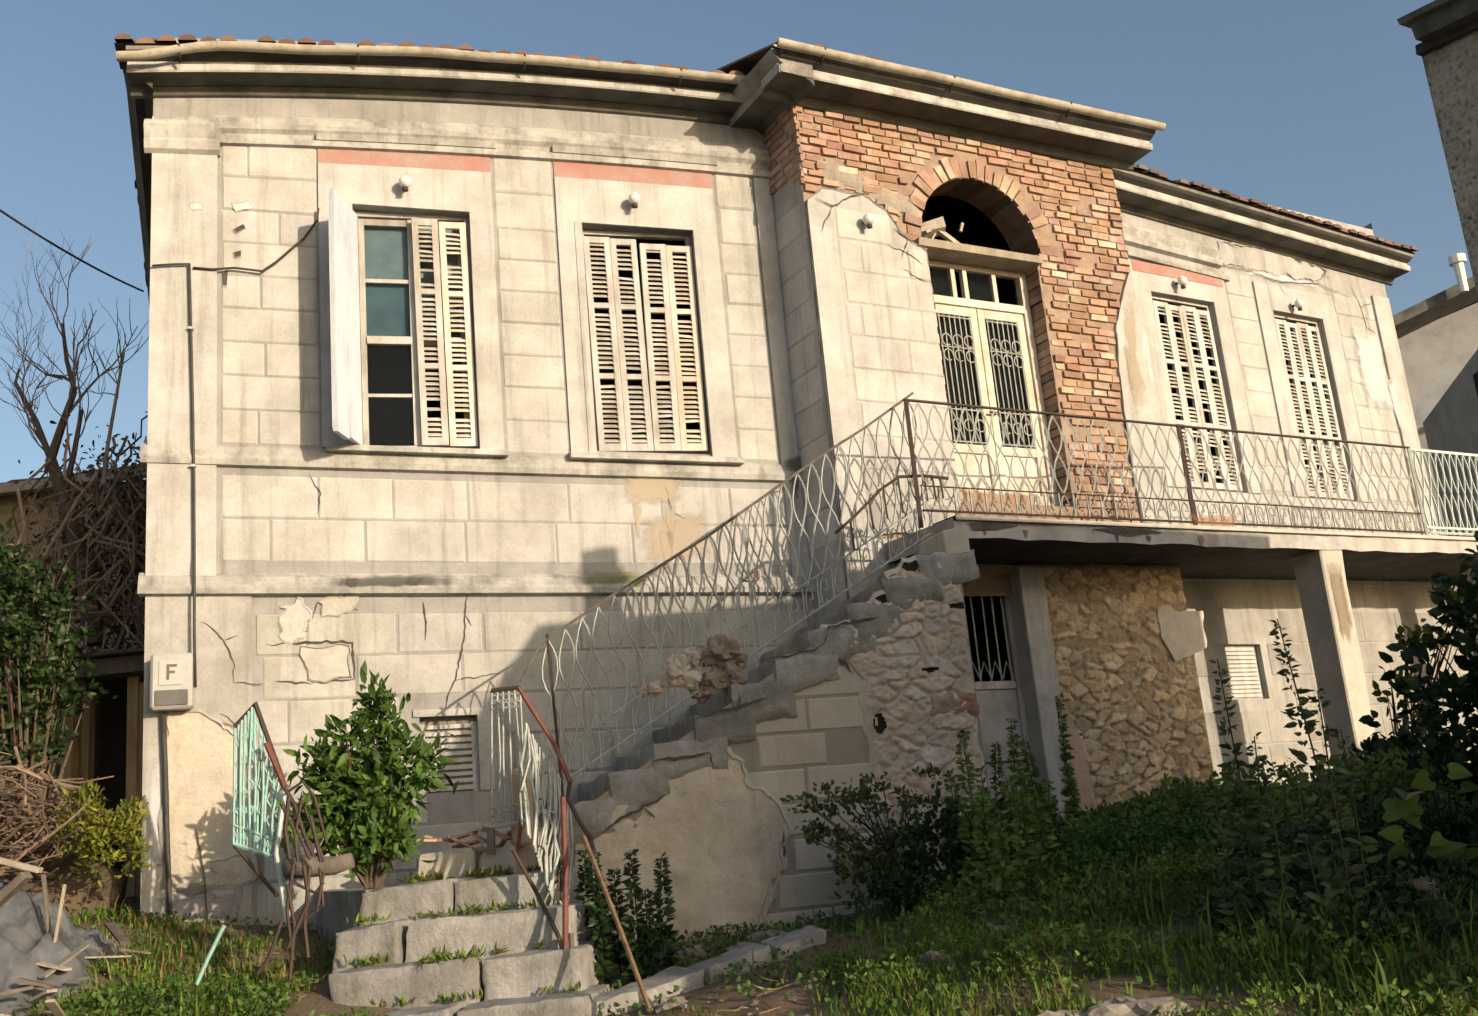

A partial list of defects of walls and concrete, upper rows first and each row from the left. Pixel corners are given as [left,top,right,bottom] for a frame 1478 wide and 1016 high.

crack [815,193,864,233]
crack [889,228,927,282]
damp [587,478,707,587]
crack [203,602,355,724]
flaking render [277,596,359,684]
crack [421,602,429,639]
crack [445,597,497,709]
flaking render [1155,610,1207,662]
flaking render [157,707,262,897]
flaking render [1061,698,1097,812]